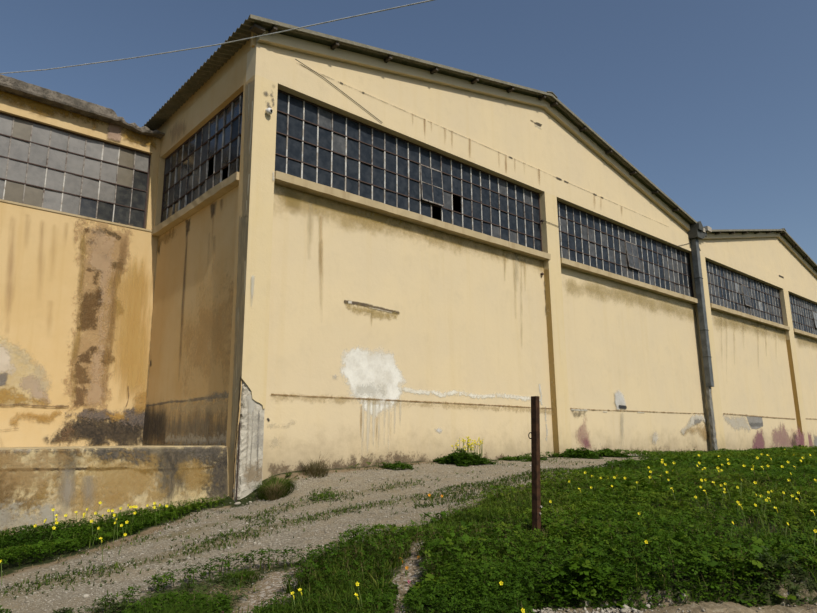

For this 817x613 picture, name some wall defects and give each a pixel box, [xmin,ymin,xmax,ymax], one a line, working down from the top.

peeling [0,337,49,406]
leakage [0,219,228,500]
peeling [723,415,763,431]